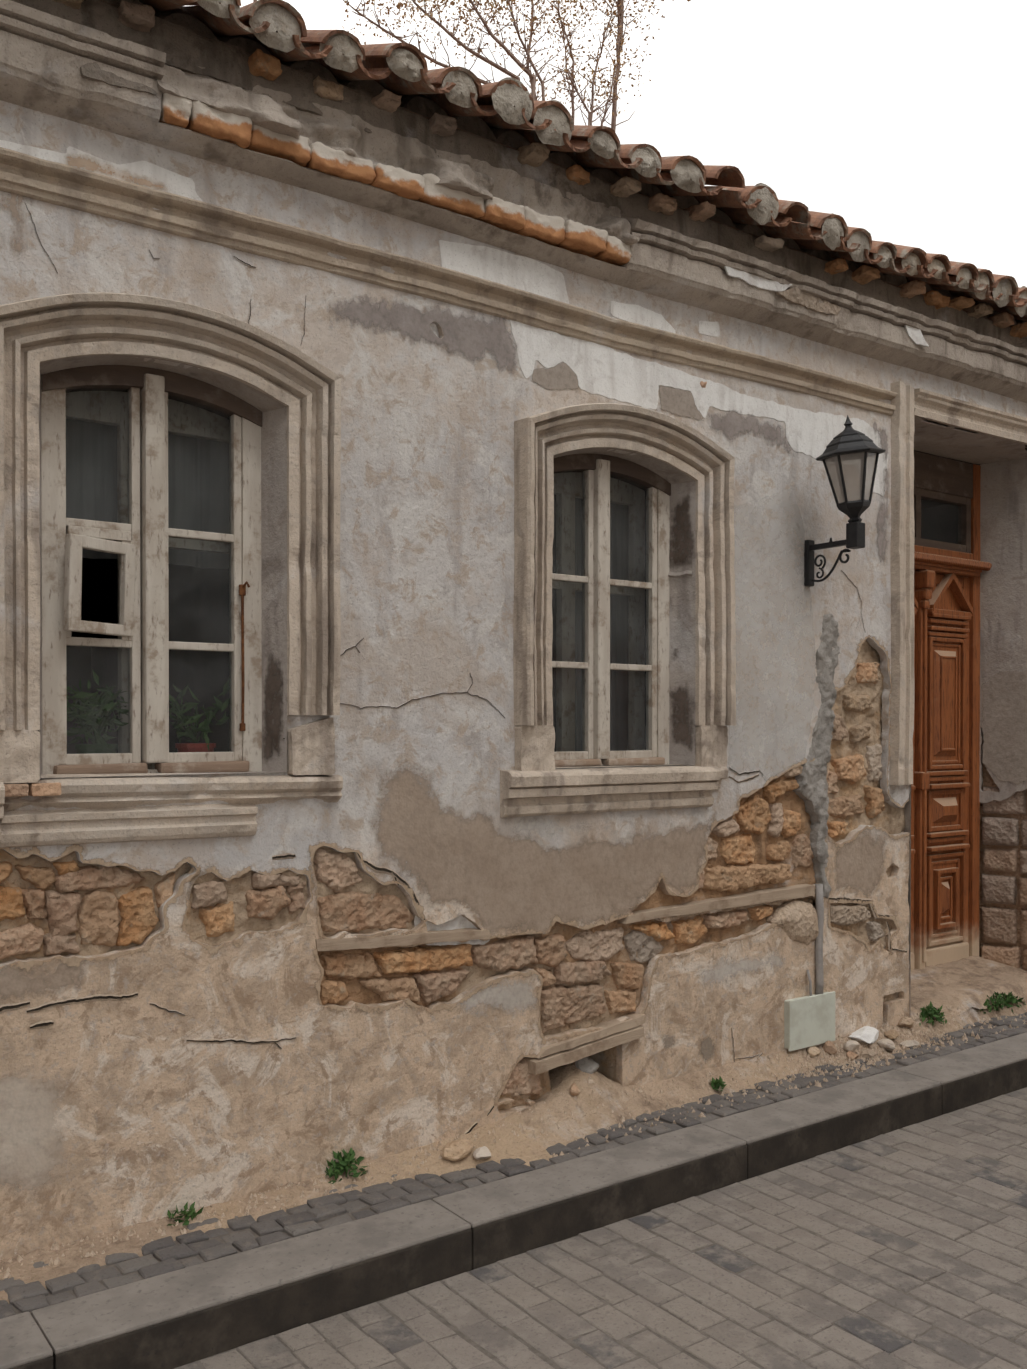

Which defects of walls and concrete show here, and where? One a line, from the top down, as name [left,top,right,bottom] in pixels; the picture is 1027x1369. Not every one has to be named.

flaking render [80,62,632,265]
peeling [439,240,570,304]
peeling [510,320,888,497]
crack [340,637,364,656]
crack [340,673,505,718]
peeling [0,635,910,1110]
crack [0,992,296,1049]